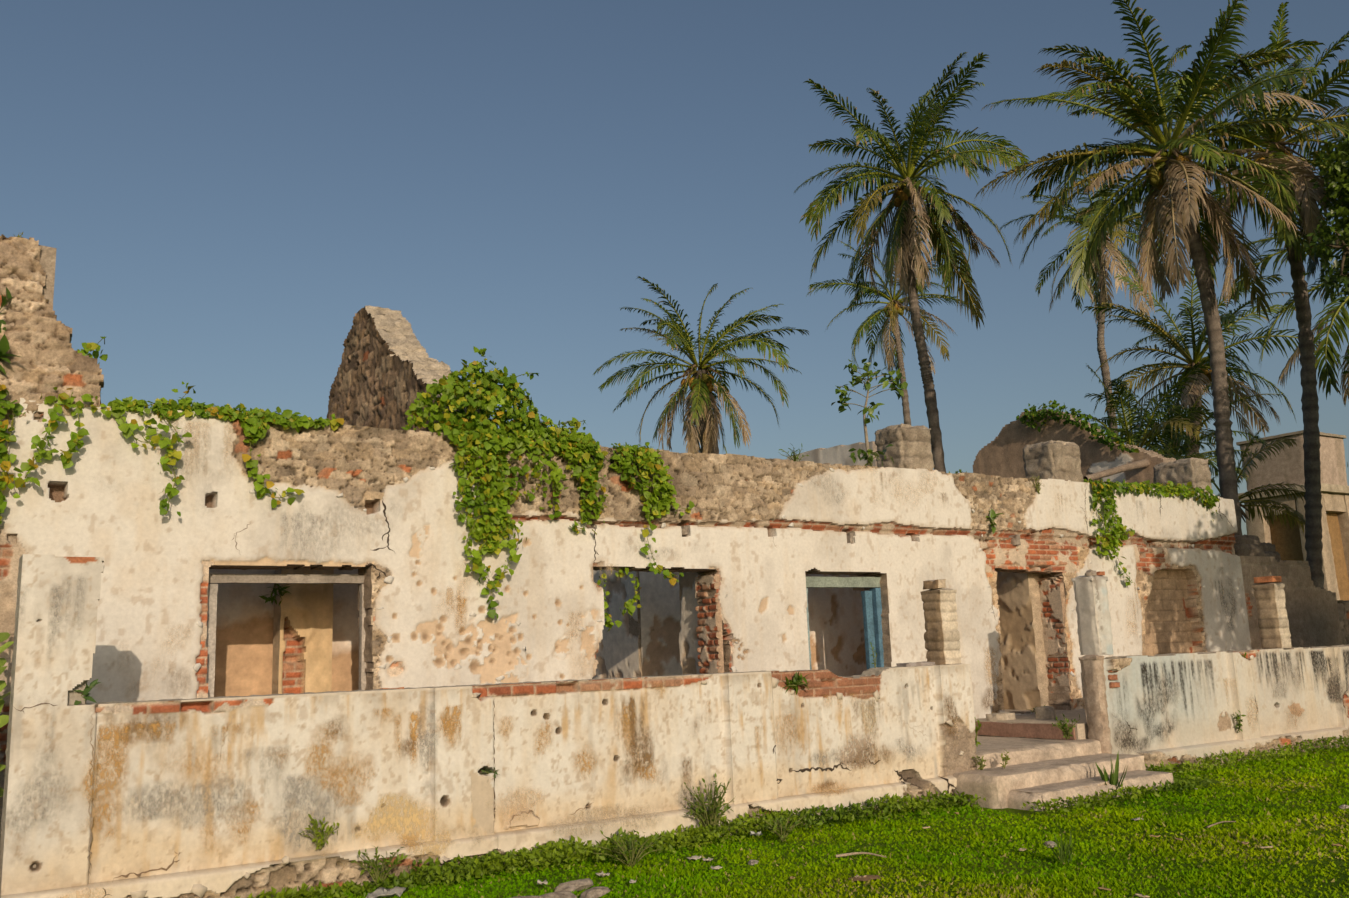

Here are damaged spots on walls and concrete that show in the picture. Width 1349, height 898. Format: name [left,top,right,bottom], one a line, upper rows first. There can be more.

spalling [230,419,880,528]
crack [367,501,393,578]
spalling [95,556,713,714]
spalling [929,470,1092,713]
peeling [1108,537,1208,688]
spalling [771,670,882,702]
water stain [1115,661,1213,749]
water stain [1257,651,1349,702]
water stain [817,736,884,767]
water stain [364,795,449,855]
water stain [470,769,540,833]
spalling [124,841,556,898]